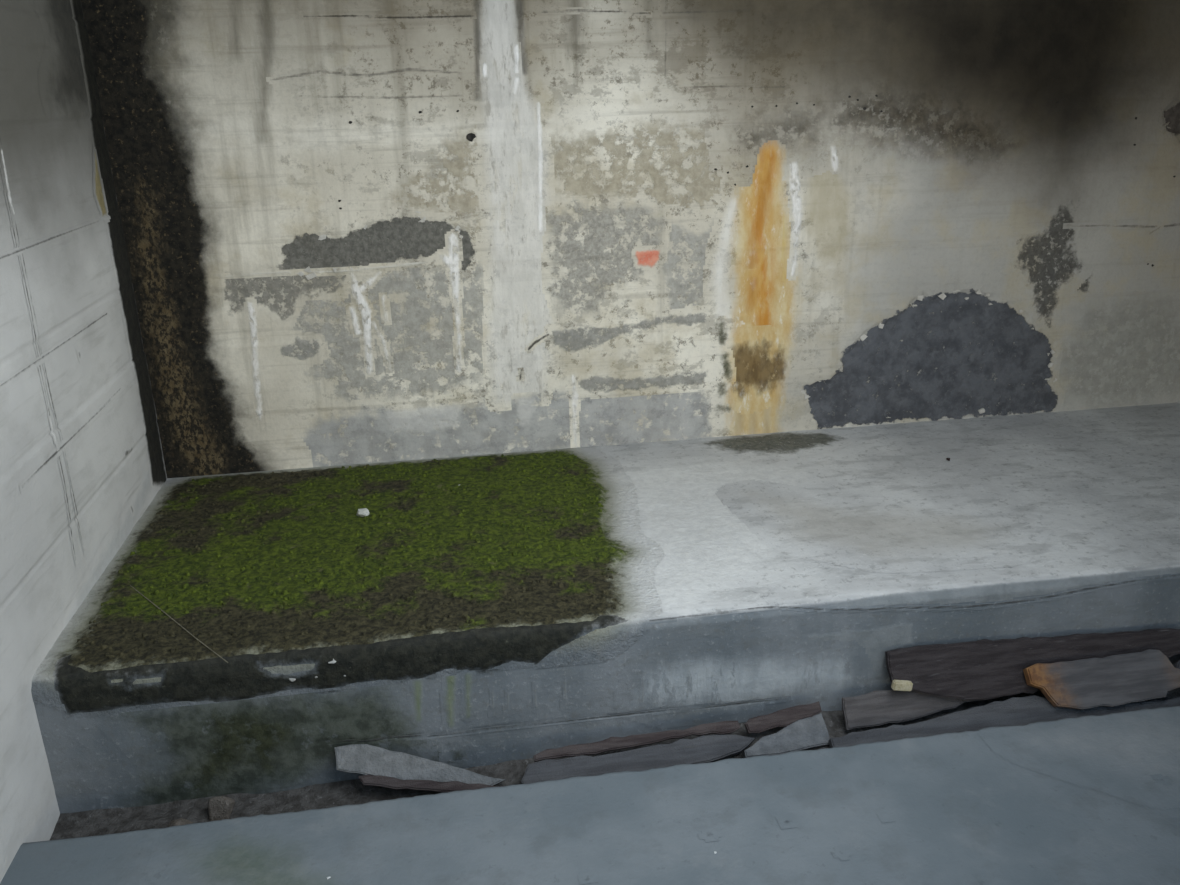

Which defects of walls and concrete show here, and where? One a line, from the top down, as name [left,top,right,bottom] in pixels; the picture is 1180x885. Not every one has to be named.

peeling [222,103,485,408]
water stain [34,0,714,630]
corrosion [703,140,814,437]
water stain [553,0,1180,411]
spalling [797,185,1097,430]
spalling [1157,93,1180,144]